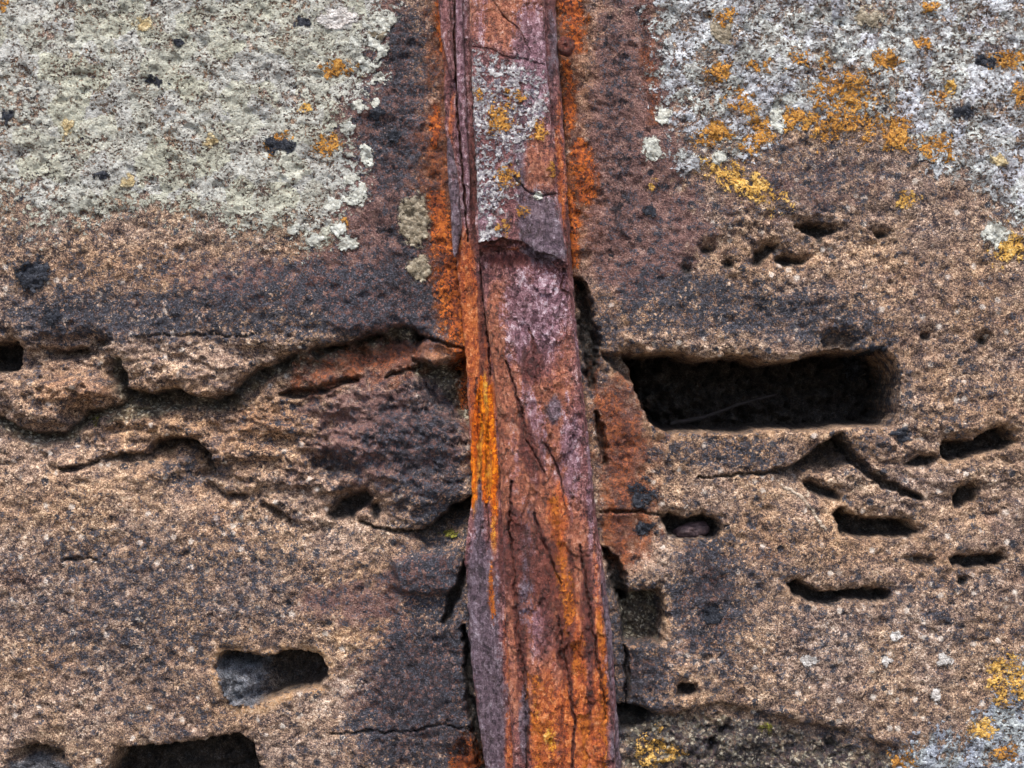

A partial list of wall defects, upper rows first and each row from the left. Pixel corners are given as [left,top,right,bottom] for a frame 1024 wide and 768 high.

rust [556,0,600,290]
rust [416,0,499,516]
rust [448,731,482,768]
crack [37,265,924,768]
rust [488,562,496,626]
rust [550,496,585,682]
rust [576,608,609,768]
rust [592,374,660,571]